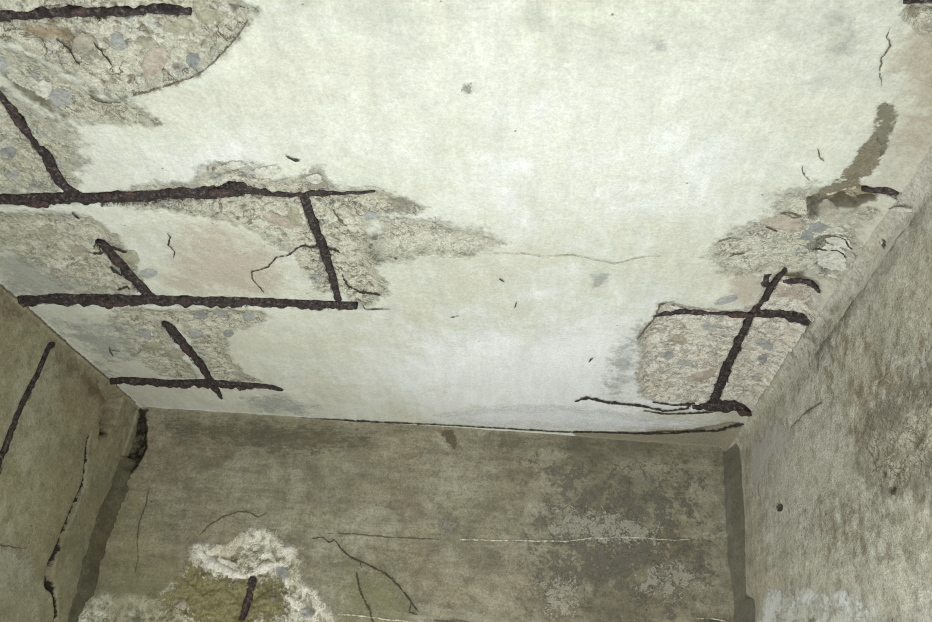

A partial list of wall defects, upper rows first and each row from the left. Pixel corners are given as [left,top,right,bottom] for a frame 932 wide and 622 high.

crack [0,285,135,403]
spalling [0,0,506,400]
spalling [635,185,902,417]
water stain [806,104,898,201]
water stain [814,145,932,355]
crack [44,429,105,620]
spalling [78,526,334,622]
crack [312,537,419,622]
peeling [518,451,717,622]